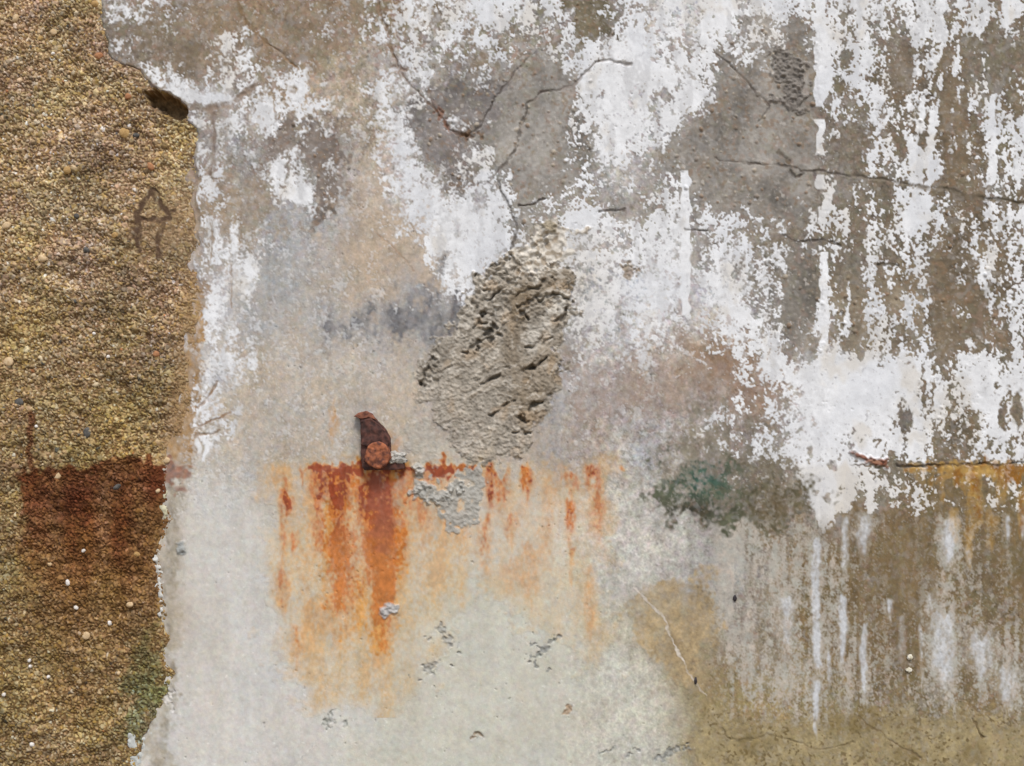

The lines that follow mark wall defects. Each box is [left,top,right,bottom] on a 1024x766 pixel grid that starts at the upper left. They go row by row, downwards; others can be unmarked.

spalling [0,0,392,766]
crack [374,0,634,250]
peeling [301,0,1024,534]
crack [714,148,1024,208]
rust [3,409,205,737]
rust [247,395,629,718]
water stain [623,473,1024,766]